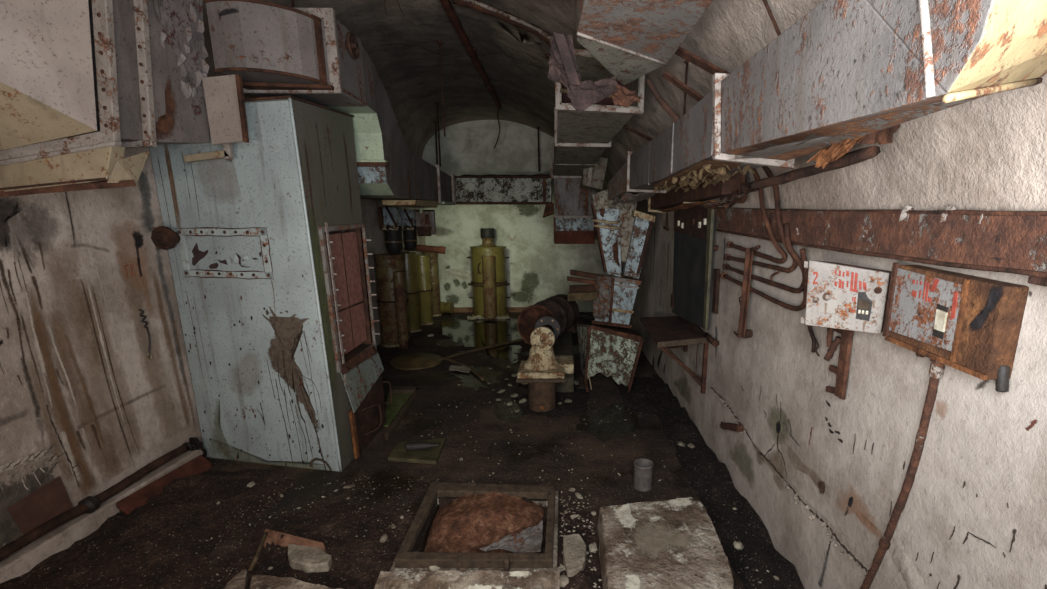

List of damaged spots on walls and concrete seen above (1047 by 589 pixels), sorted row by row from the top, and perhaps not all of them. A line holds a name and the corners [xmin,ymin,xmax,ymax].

water stain [133,172,153,277]
water stain [0,242,48,417]
water stain [81,251,132,453]
water stain [156,247,193,417]
crack [750,394,787,483]